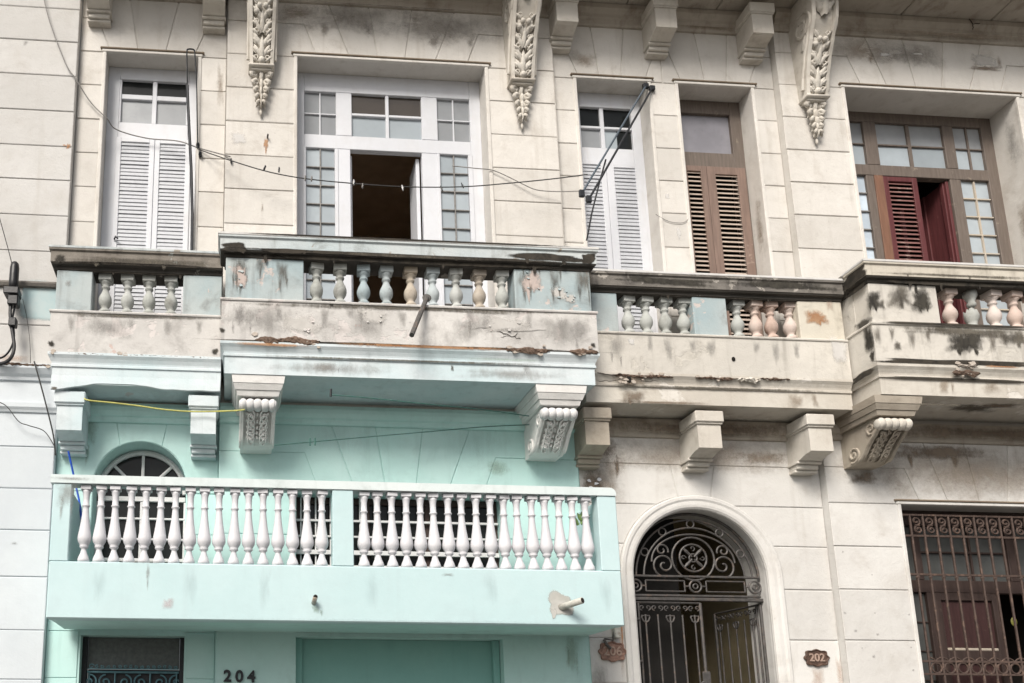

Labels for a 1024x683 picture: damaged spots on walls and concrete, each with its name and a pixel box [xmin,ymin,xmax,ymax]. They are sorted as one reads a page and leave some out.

peeling [522,269,576,302]
rust [808,312,826,325]
damp [842,264,1024,384]
spalling [252,332,321,349]
spalling [506,345,550,356]
spalling [569,343,599,356]
spalling [615,372,674,384]
spalling [952,367,980,378]